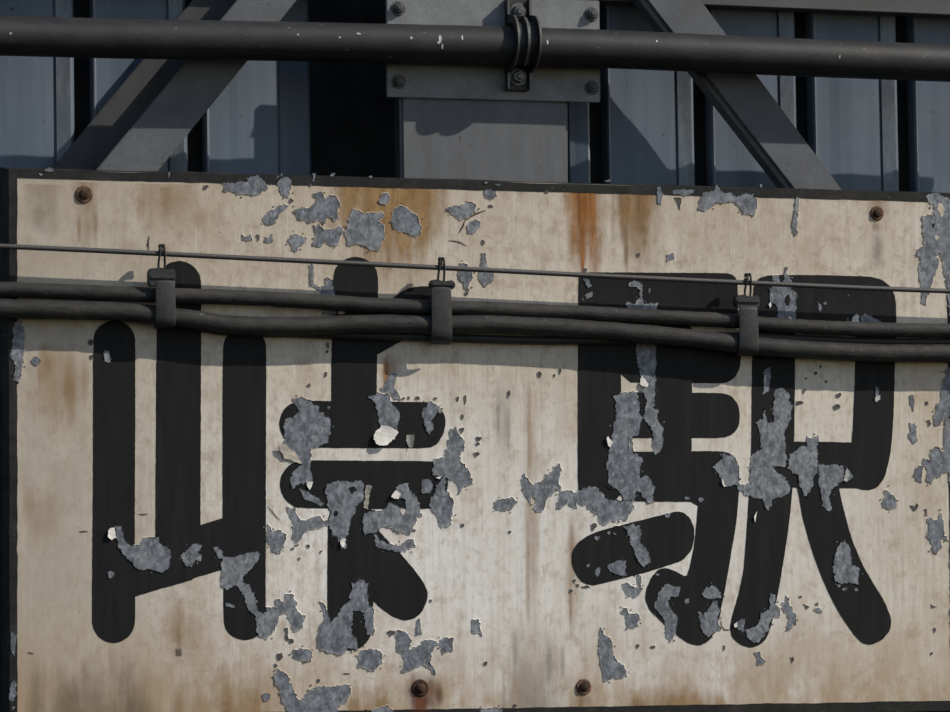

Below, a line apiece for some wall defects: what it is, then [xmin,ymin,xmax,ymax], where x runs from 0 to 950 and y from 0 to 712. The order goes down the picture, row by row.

peeling [309,264,335,295]
peeling [222,173,423,253]
rust [568,192,597,273]
peeling [915,191,950,316]
peeling [10,319,41,383]
peeling [712,364,853,521]
peeling [908,366,950,486]
peeling [493,343,725,643]
peeling [108,372,483,712]
peeling [832,539,864,592]
peeling [734,592,823,666]